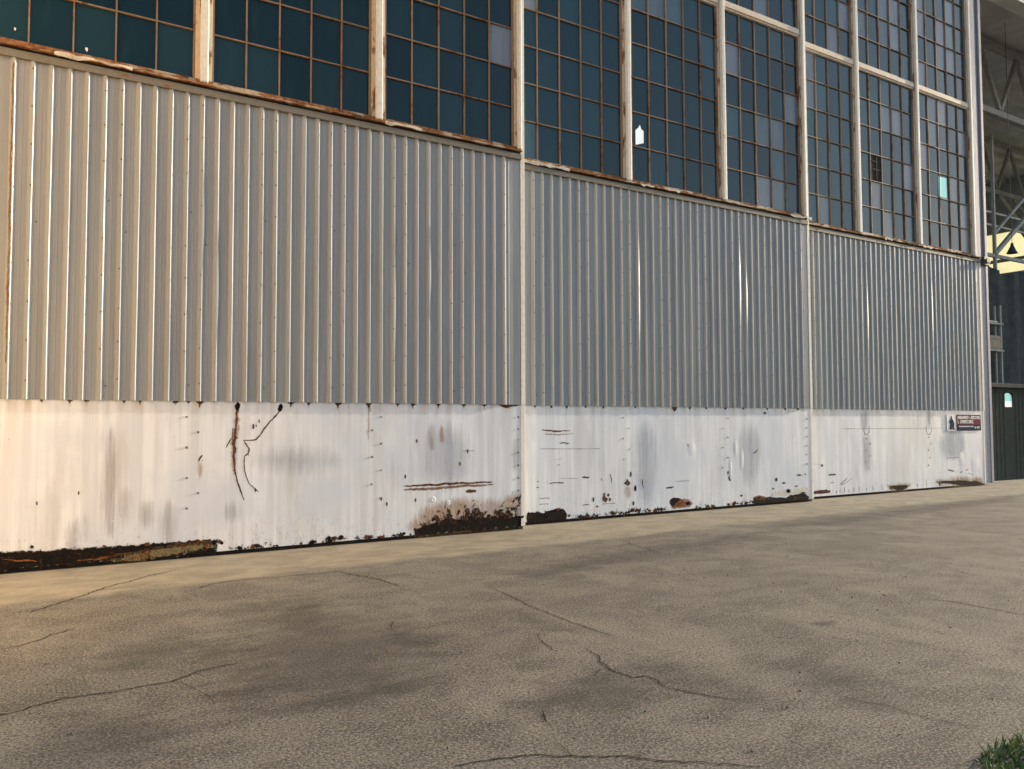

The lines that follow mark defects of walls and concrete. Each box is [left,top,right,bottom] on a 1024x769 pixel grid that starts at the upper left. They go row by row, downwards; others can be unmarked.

rust [226,402,244,500]
crack [243,404,283,492]
rust [292,481,845,548]
rust [0,539,279,573]
crack [490,587,741,701]
crack [0,663,239,715]
crack [456,710,745,766]